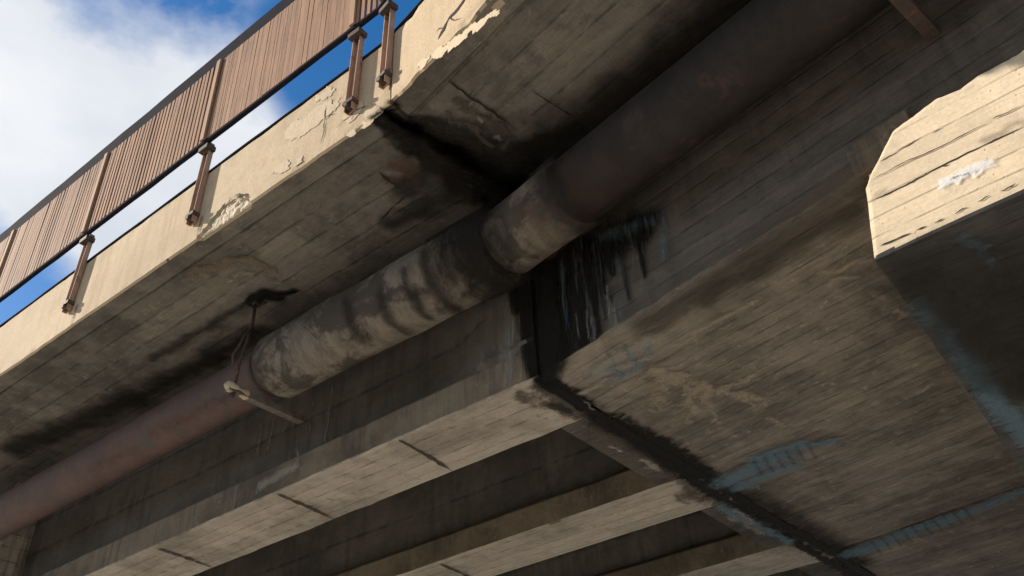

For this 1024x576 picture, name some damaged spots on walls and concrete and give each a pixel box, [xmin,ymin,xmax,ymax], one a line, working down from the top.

peeling [417,9,500,70]
crack [448,81,514,129]
leakage [368,0,752,228]
crack [872,107,1021,200]
spalling [200,193,251,240]
crack [880,183,1016,246]
leakage [149,307,243,361]
leakage [504,206,874,576]
crack [399,440,453,472]
crack [277,494,335,520]